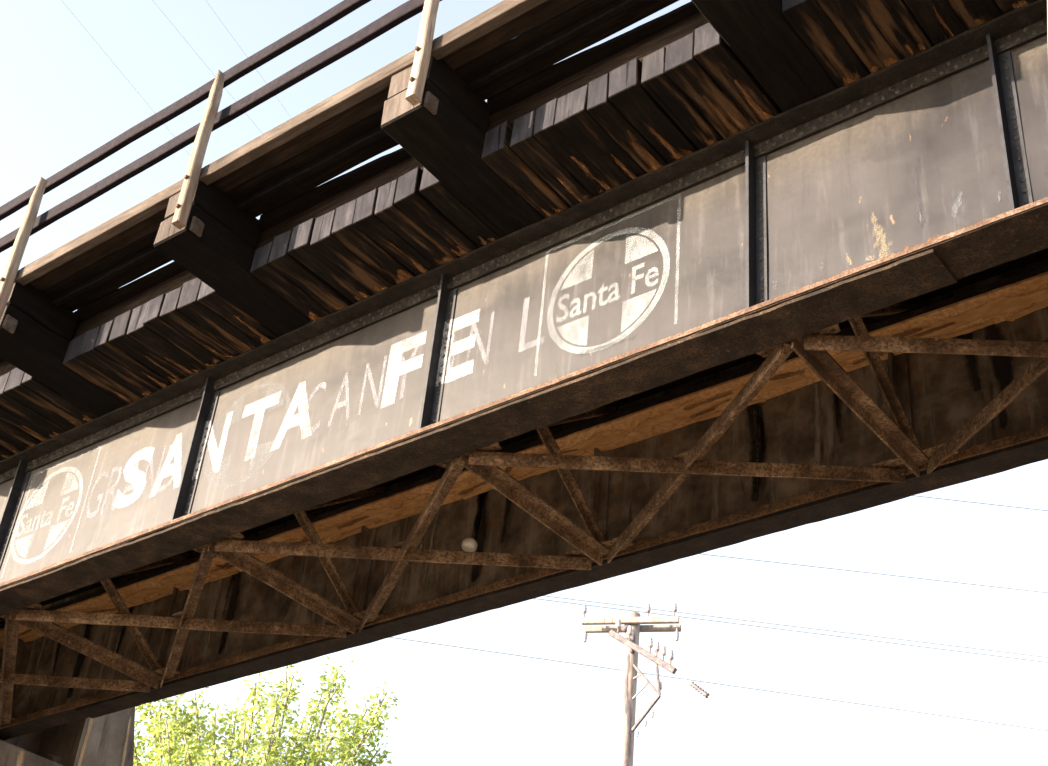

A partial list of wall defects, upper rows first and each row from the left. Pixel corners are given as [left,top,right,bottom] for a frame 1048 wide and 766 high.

corrosion [891,289,1048,339]
corrosion [143,345,233,396]
water stain [746,401,766,463]
corrosion [448,477,494,500]
corrosion [281,494,431,543]
corrosion [54,562,239,629]